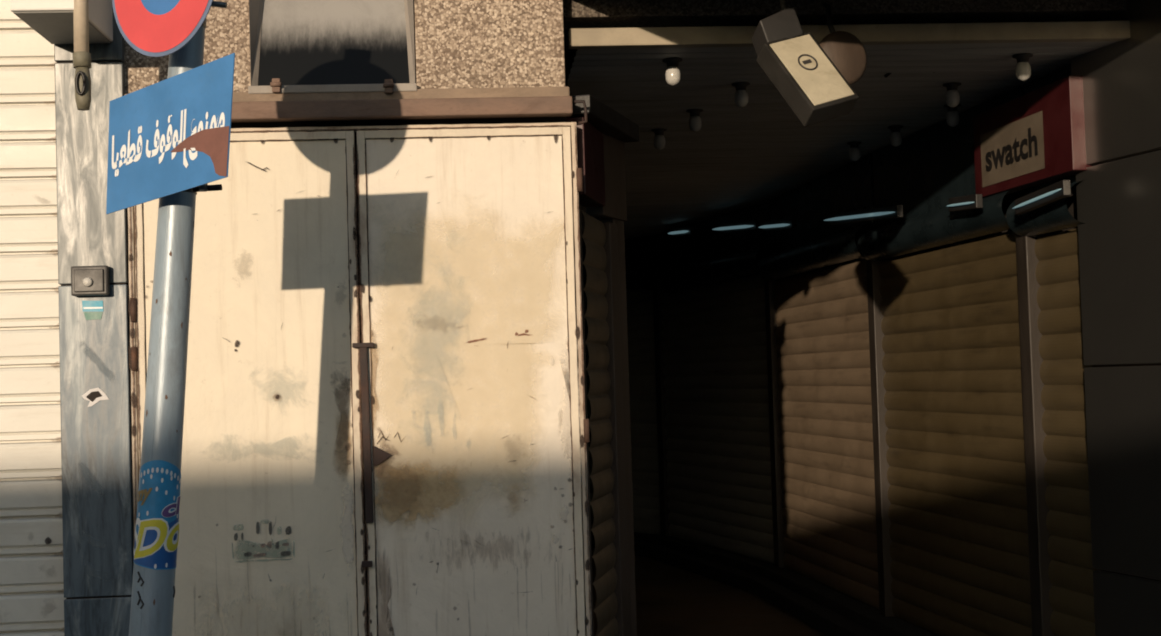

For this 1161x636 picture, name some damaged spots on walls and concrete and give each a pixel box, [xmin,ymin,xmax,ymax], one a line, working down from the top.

rust [230,125,591,636]